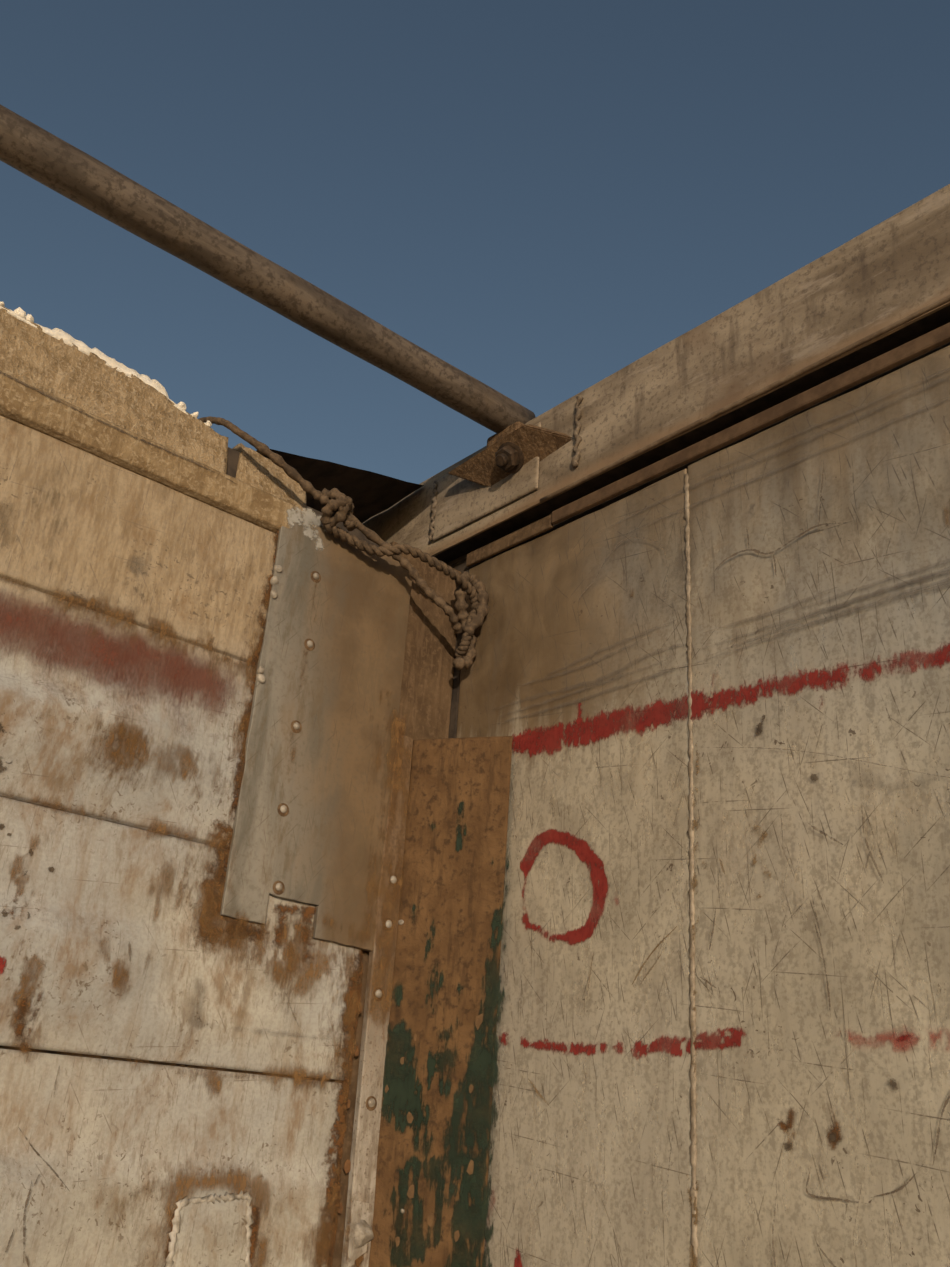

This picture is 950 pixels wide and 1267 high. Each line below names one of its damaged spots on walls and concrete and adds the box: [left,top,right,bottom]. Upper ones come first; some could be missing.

rust [53,591,134,629]
rust [93,720,193,778]
rust [147,530,330,995]
peeling [456,800,466,852]
rust [105,954,128,987]
rust [208,1071,222,1093]
rust [267,953,363,1267]
peeling [381,885,508,1267]
rust [165,1168,268,1267]